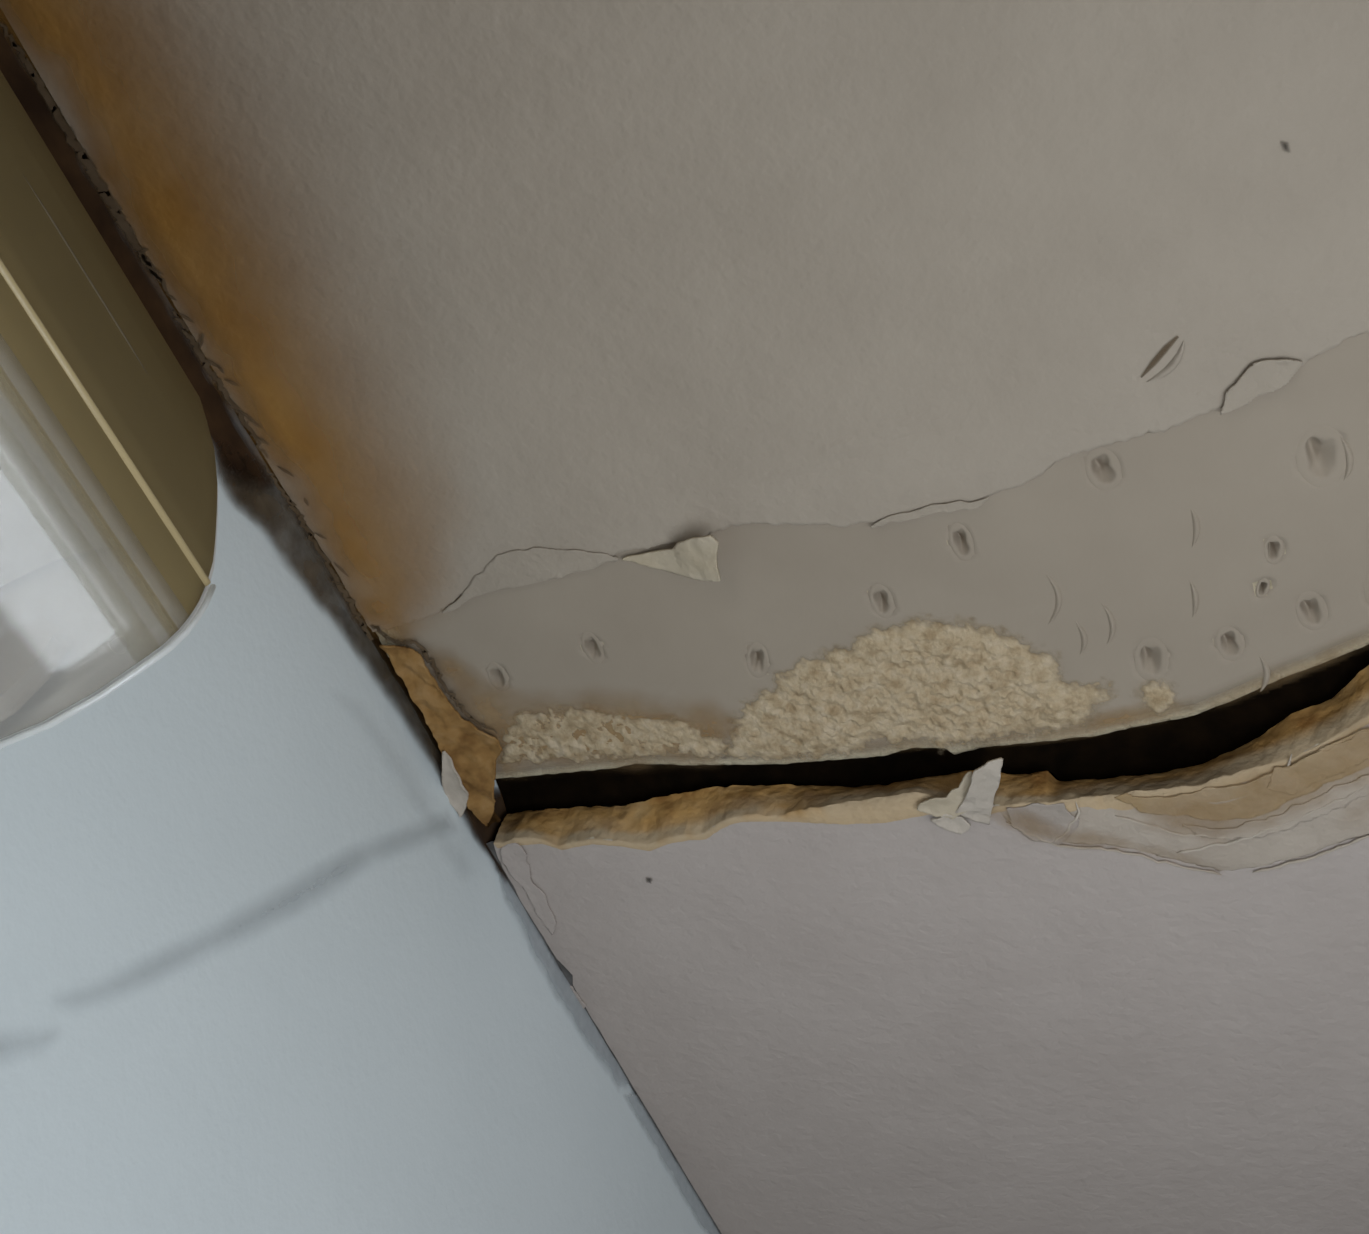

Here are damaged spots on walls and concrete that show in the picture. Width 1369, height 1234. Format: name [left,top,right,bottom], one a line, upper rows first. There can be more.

damp [0,15,442,771]
crack [0,8,498,755]
spalling [1084,447,1123,491]
peeling [622,535,721,581]
spalling [947,523,975,561]
spalling [1255,536,1285,598]
flaking render [379,584,1369,876]
damp [464,790,510,878]
crack [487,644,1369,1234]